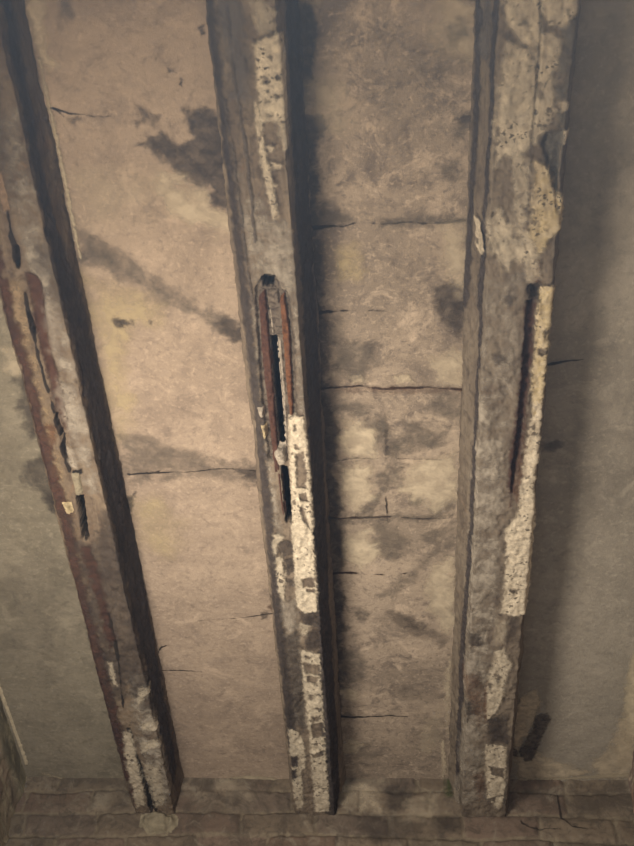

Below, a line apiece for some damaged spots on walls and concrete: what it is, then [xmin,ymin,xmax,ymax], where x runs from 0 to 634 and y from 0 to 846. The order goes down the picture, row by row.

water stain [138,108,229,230]
peeling [474,0,577,279]
rust [0,251,136,802]
crack [127,469,170,477]
water stain [267,447,295,586]
spalling [254,274,318,613]
water stain [298,2,457,700]
crack [328,497,445,520]
crack [321,384,462,392]
rust [508,282,543,507]
peeling [501,286,555,616]
peeling [288,650,330,812]